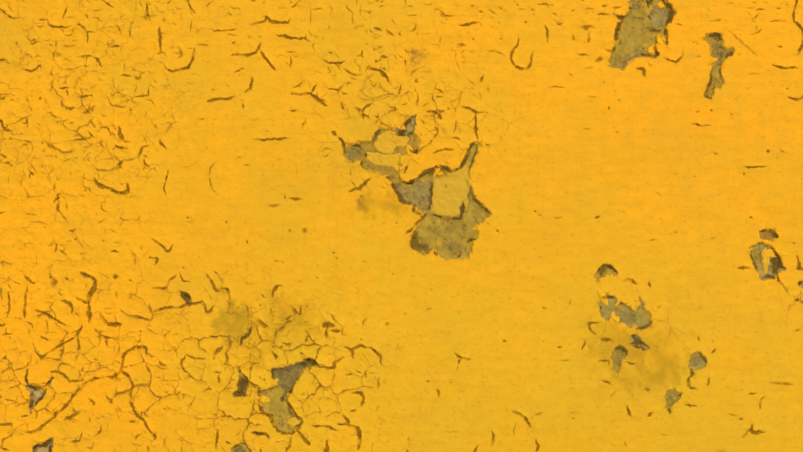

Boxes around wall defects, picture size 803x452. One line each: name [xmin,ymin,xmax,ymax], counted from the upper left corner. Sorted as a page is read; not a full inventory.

crack [236,16,307,89]
crack [291,85,371,116]
peeling [608,0,676,70]
peeling [704,32,735,99]
crack [94,126,165,194]
peeling [332,115,491,260]
peeling [748,229,786,280]
crack [0,272,229,449]
crack [319,322,382,369]
peeling [594,264,651,373]
peeling [233,358,318,436]
crack [248,380,365,452]